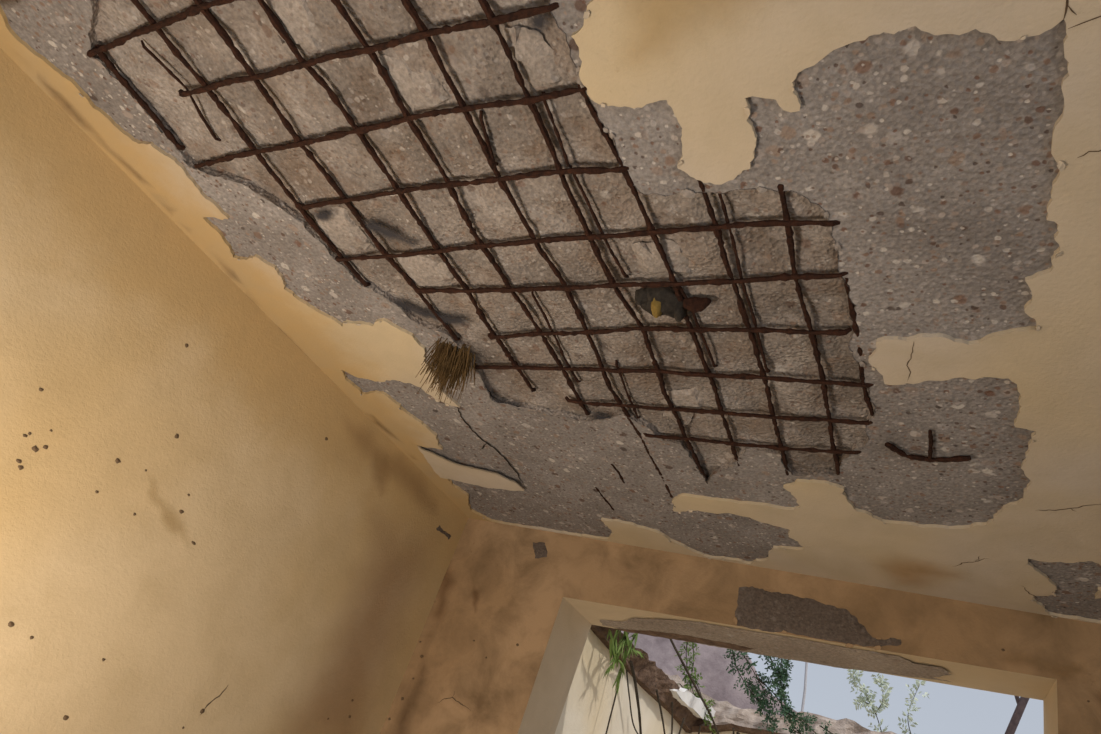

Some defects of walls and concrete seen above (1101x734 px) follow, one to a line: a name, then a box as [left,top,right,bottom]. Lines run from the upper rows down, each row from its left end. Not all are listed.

crack [1064,0,1101,29]
flaking render [0,0,1068,561]
flaking render [590,586,951,734]
flaking render [1026,559,1101,620]